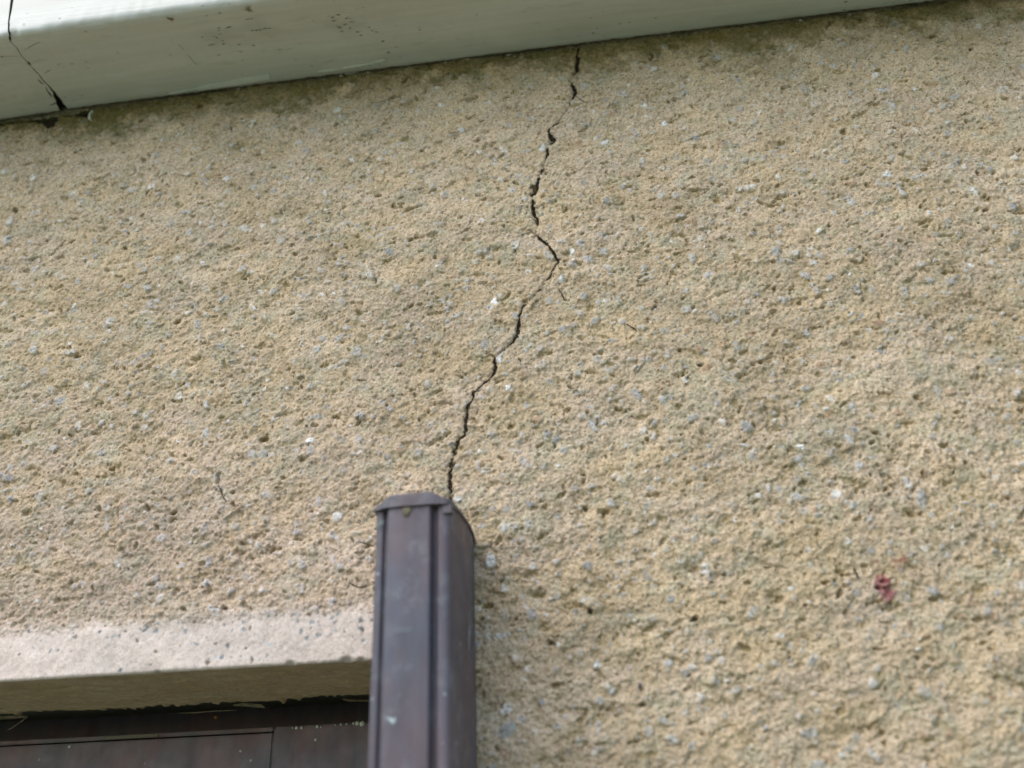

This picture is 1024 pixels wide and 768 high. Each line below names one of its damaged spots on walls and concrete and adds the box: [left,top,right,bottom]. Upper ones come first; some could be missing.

crack [6,0,41,57]
crack [25,70,66,118]
crack [448,47,587,500]